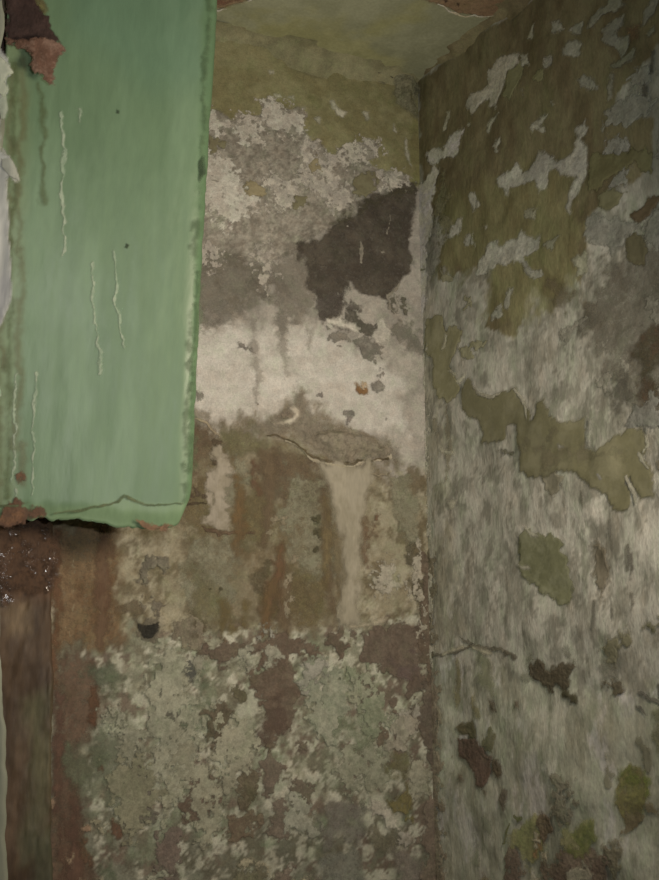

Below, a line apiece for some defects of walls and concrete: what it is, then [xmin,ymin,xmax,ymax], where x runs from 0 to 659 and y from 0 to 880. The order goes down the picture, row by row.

peeling [0,49,13,119]
peeling [497,0,659,276]
peeling [0,148,19,325]
leakage [199,183,424,354]
peeling [202,54,655,511]
corrosion [0,497,47,528]
crack [267,434,392,476]
peeling [518,527,574,605]
peeling [591,542,610,630]
corrosion [50,521,126,880]
peeling [84,493,502,880]
flaking render [504,649,578,704]